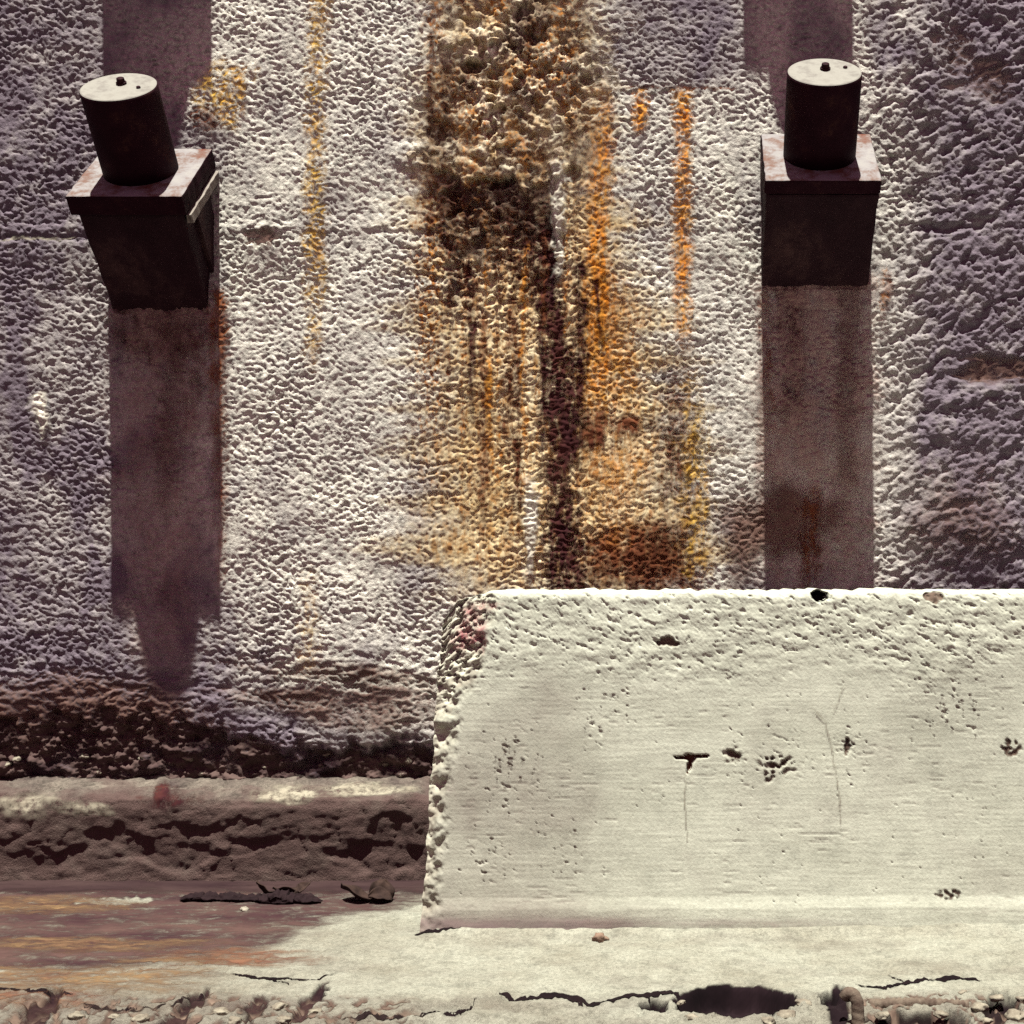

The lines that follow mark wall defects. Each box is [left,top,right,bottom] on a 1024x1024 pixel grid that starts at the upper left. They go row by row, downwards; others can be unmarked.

rust [406,0,708,590]
leakage [0,675,187,747]
leakage [260,691,337,721]
leakage [292,664,410,727]
crack [858,975,982,989]
spalling [640,984,850,1024]
spalling [863,989,1024,1024]